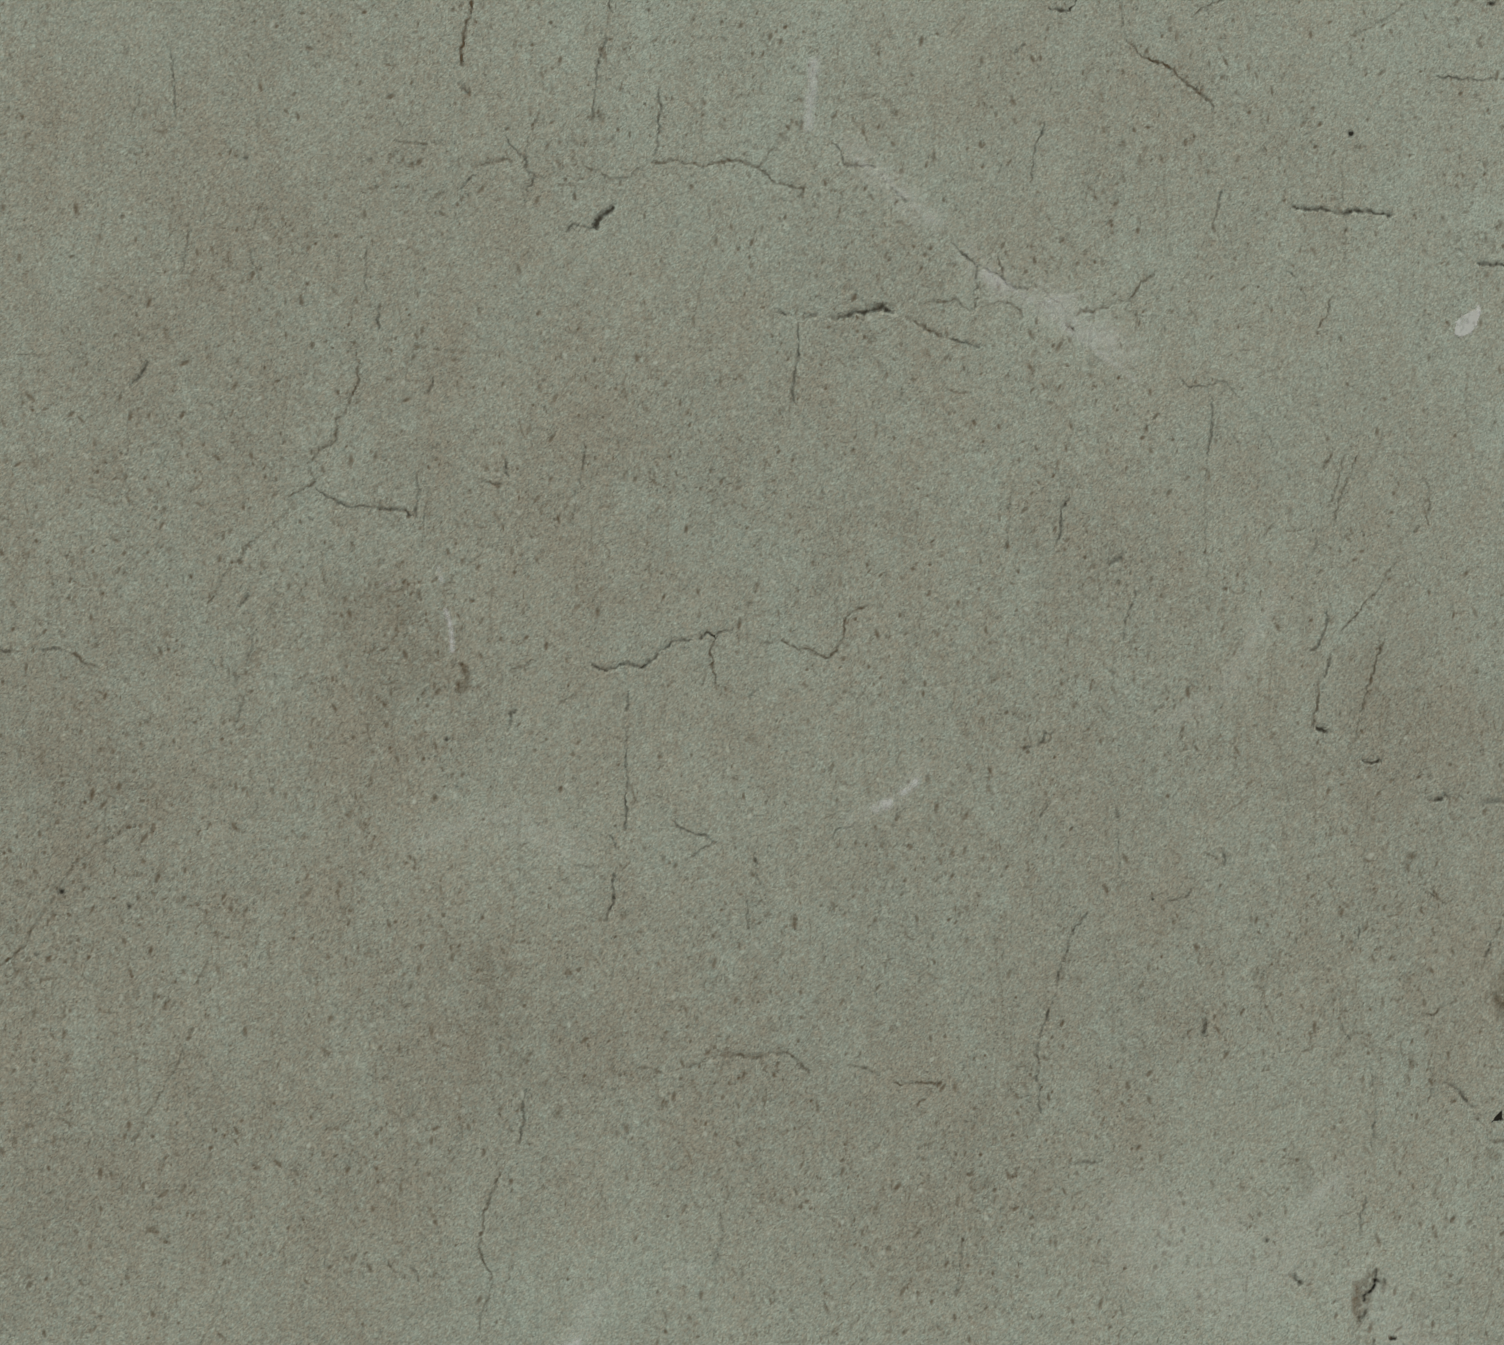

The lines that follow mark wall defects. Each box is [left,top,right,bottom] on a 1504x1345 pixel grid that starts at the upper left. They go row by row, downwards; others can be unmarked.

crack [460,0,473,63]
crack [1148,57,1207,99]
crack [1295,206,1390,217]
crack [846,305,889,316]